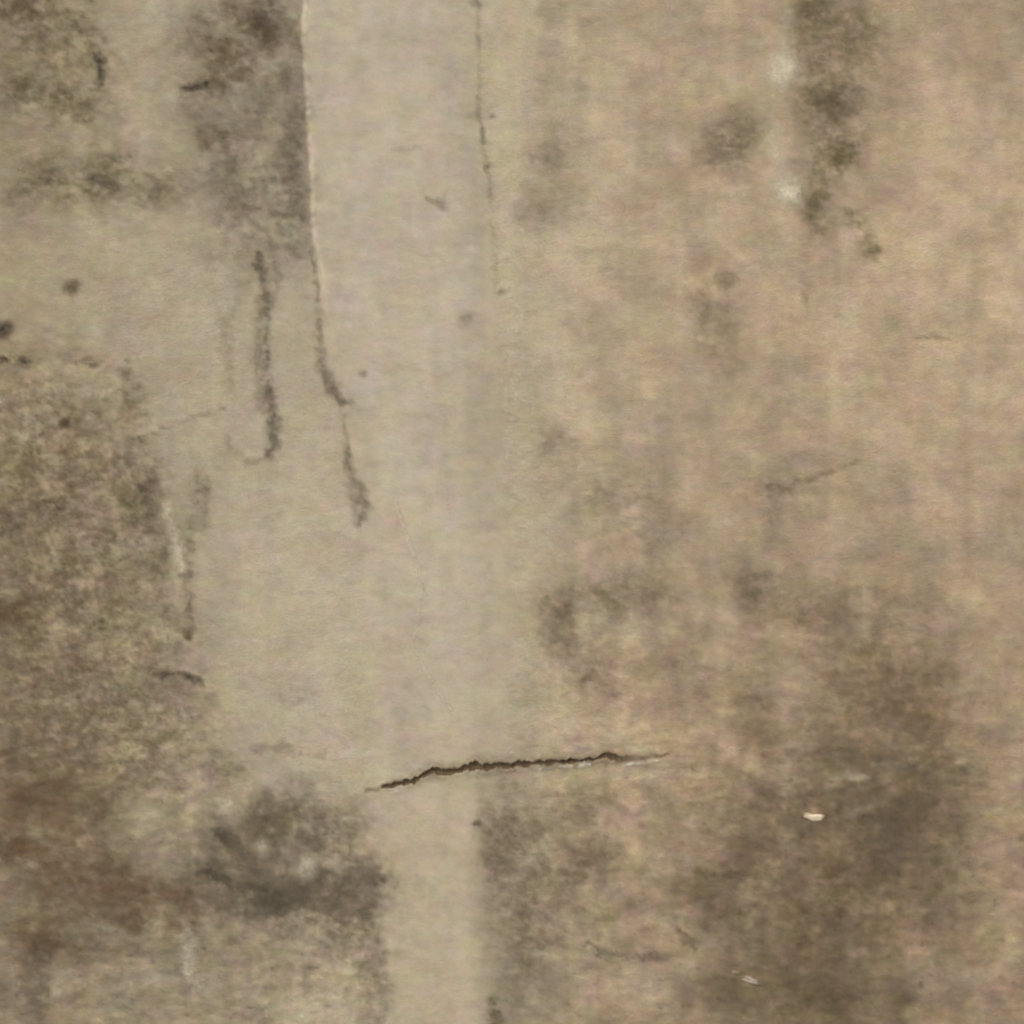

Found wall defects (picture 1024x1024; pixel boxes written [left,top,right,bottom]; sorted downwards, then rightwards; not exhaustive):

crack [380,747,662,793]
damp [197,799,383,943]